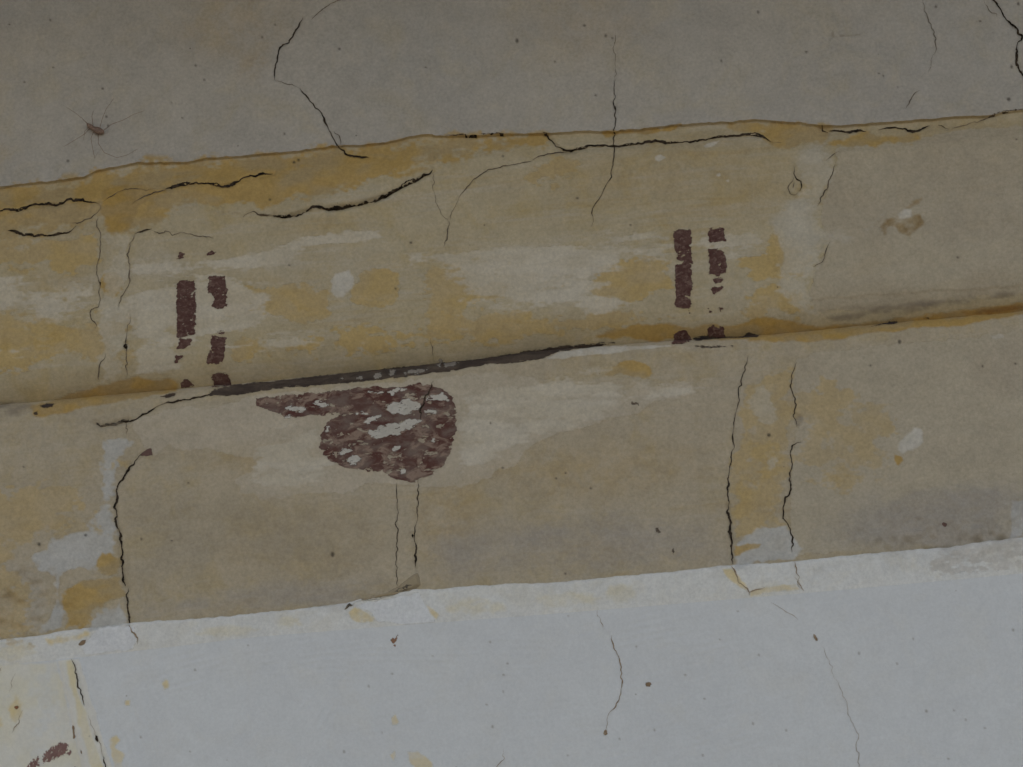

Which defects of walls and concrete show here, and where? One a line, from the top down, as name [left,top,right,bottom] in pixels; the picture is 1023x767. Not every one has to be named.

crack [984,0,1023,76]
crack [243,31,781,245]
water stain [724,119,923,162]
water stain [0,127,584,293]
water stain [118,227,1023,364]
water stain [0,348,180,421]
crack [113,454,142,644]
water stain [0,458,391,664]
peeling [285,400,329,418]
peeling [332,448,361,465]
peeling [356,387,449,424]
crack [726,358,795,617]